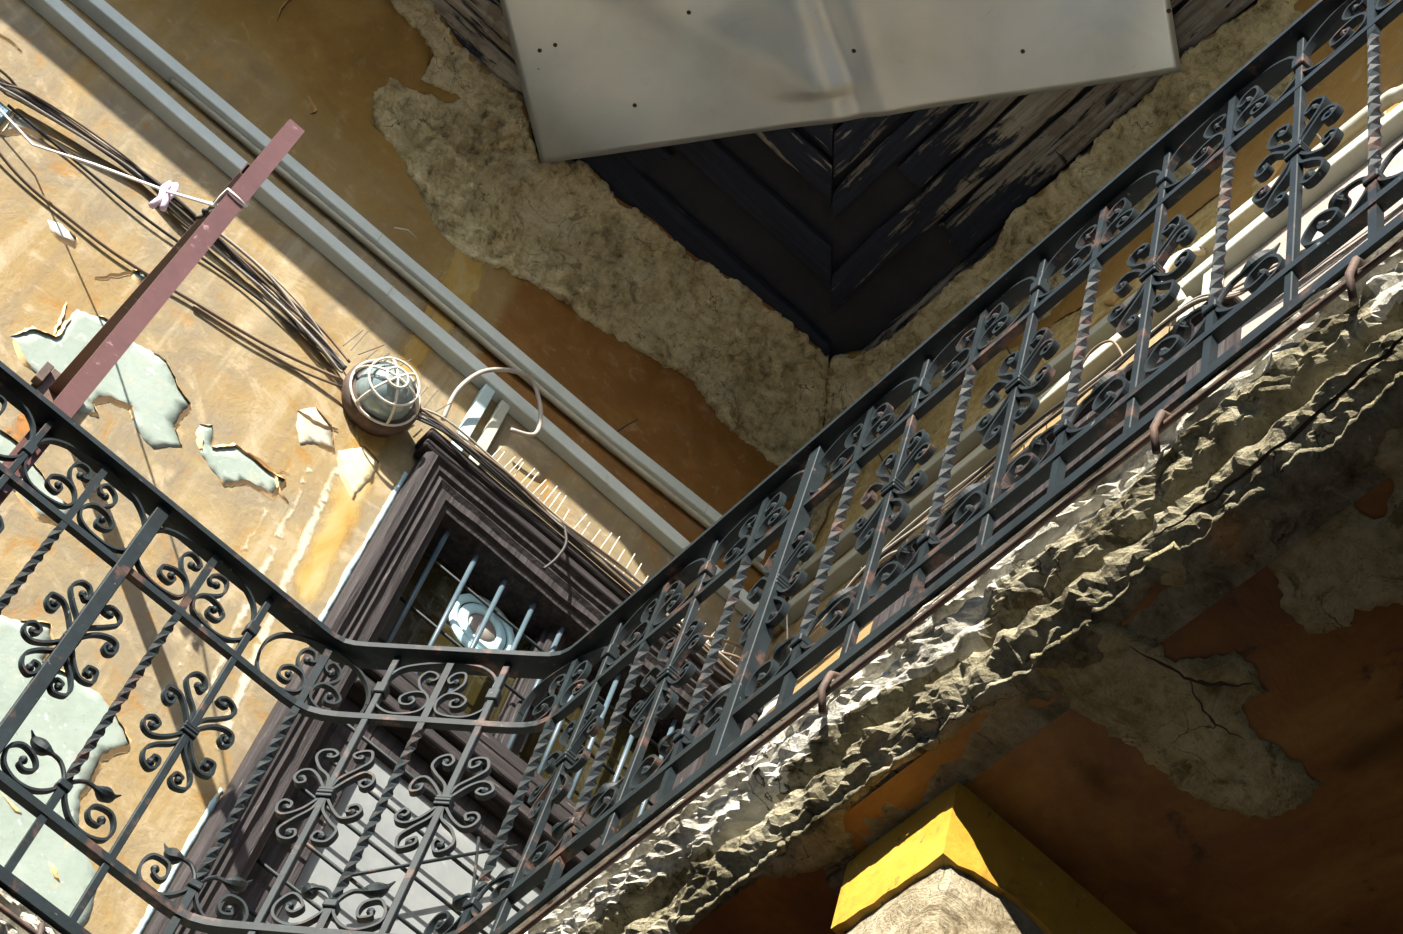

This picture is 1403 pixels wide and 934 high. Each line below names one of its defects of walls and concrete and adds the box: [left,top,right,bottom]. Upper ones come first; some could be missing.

spalling [372,0,1302,467]
peeling [11,309,109,374]
peeling [0,429,19,463]
peeling [13,463,71,526]
peeling [78,342,287,500]
peeling [296,407,382,499]
peeling [318,471,408,622]
spalling [513,235,1403,934]
peeling [0,615,55,722]
crack [1129,646,1256,740]
peeling [0,669,131,926]
peeling [133,787,224,934]